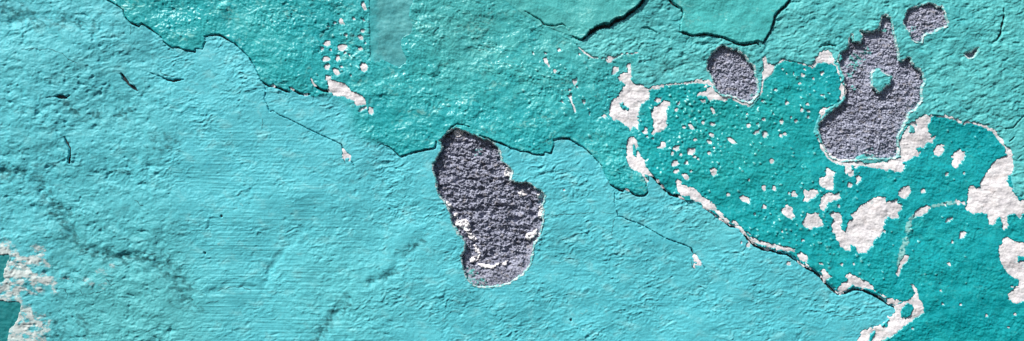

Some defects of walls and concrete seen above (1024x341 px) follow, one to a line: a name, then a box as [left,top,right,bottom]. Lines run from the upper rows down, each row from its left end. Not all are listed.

crack [109,1,345,162]
peeling [290,0,413,115]
crack [528,0,655,41]
crack [669,0,790,46]
spalling [432,127,546,288]
spalling [561,2,1024,341]
peeling [0,254,11,282]
peeling [0,300,21,341]